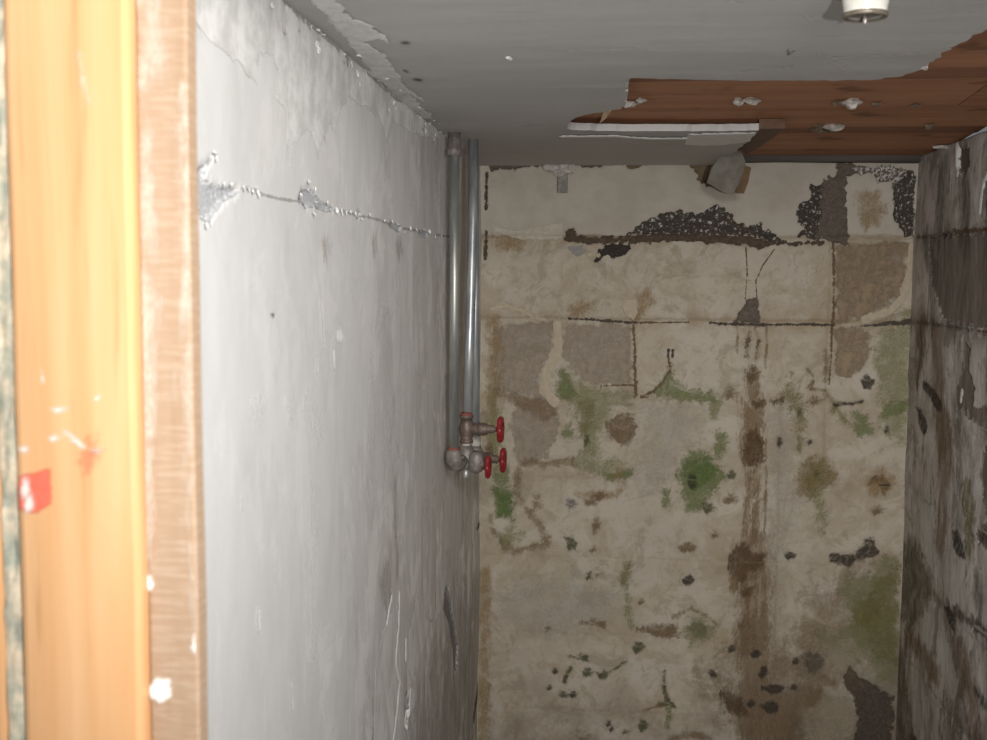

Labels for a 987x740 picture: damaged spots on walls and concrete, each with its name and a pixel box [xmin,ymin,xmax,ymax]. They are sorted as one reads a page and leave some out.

peeling [684,132,757,146]